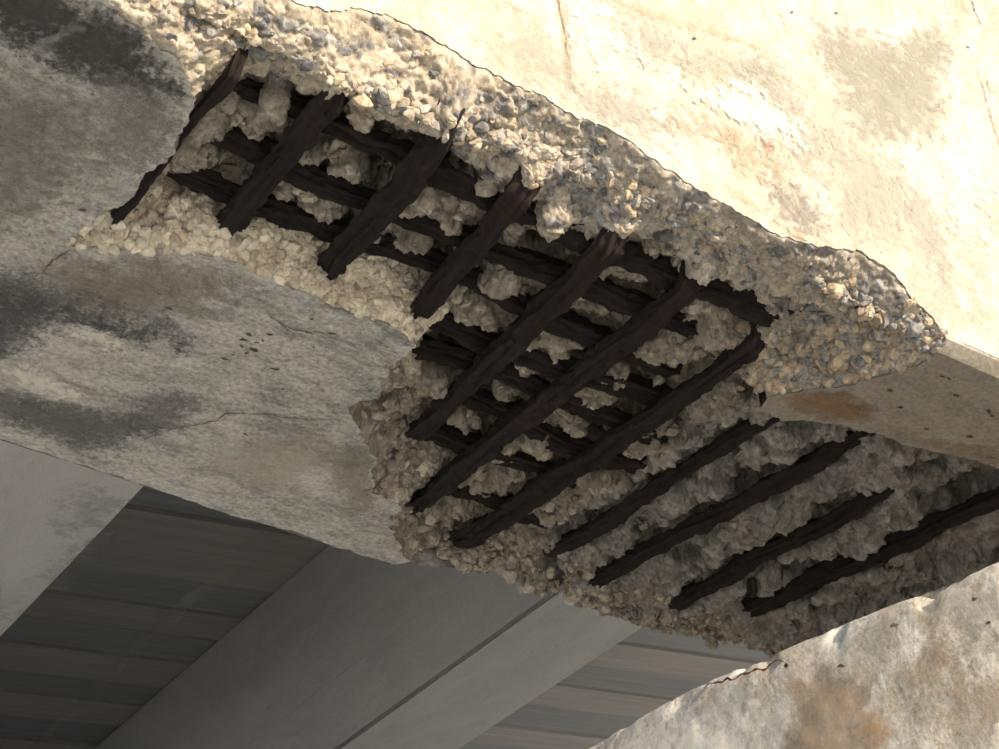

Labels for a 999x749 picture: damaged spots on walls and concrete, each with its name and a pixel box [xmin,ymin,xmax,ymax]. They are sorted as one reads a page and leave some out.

damp [0,0,186,107]
crack [558,0,572,74]
peeling [0,359,102,403]
damp [0,267,204,371]
damp [0,391,210,455]
rust [109,47,795,558]
spalling [56,0,949,584]
rust [588,430,876,588]
spalling [517,420,999,659]
rust [669,487,895,611]
rust [741,486,999,618]
crack [703,660,785,686]